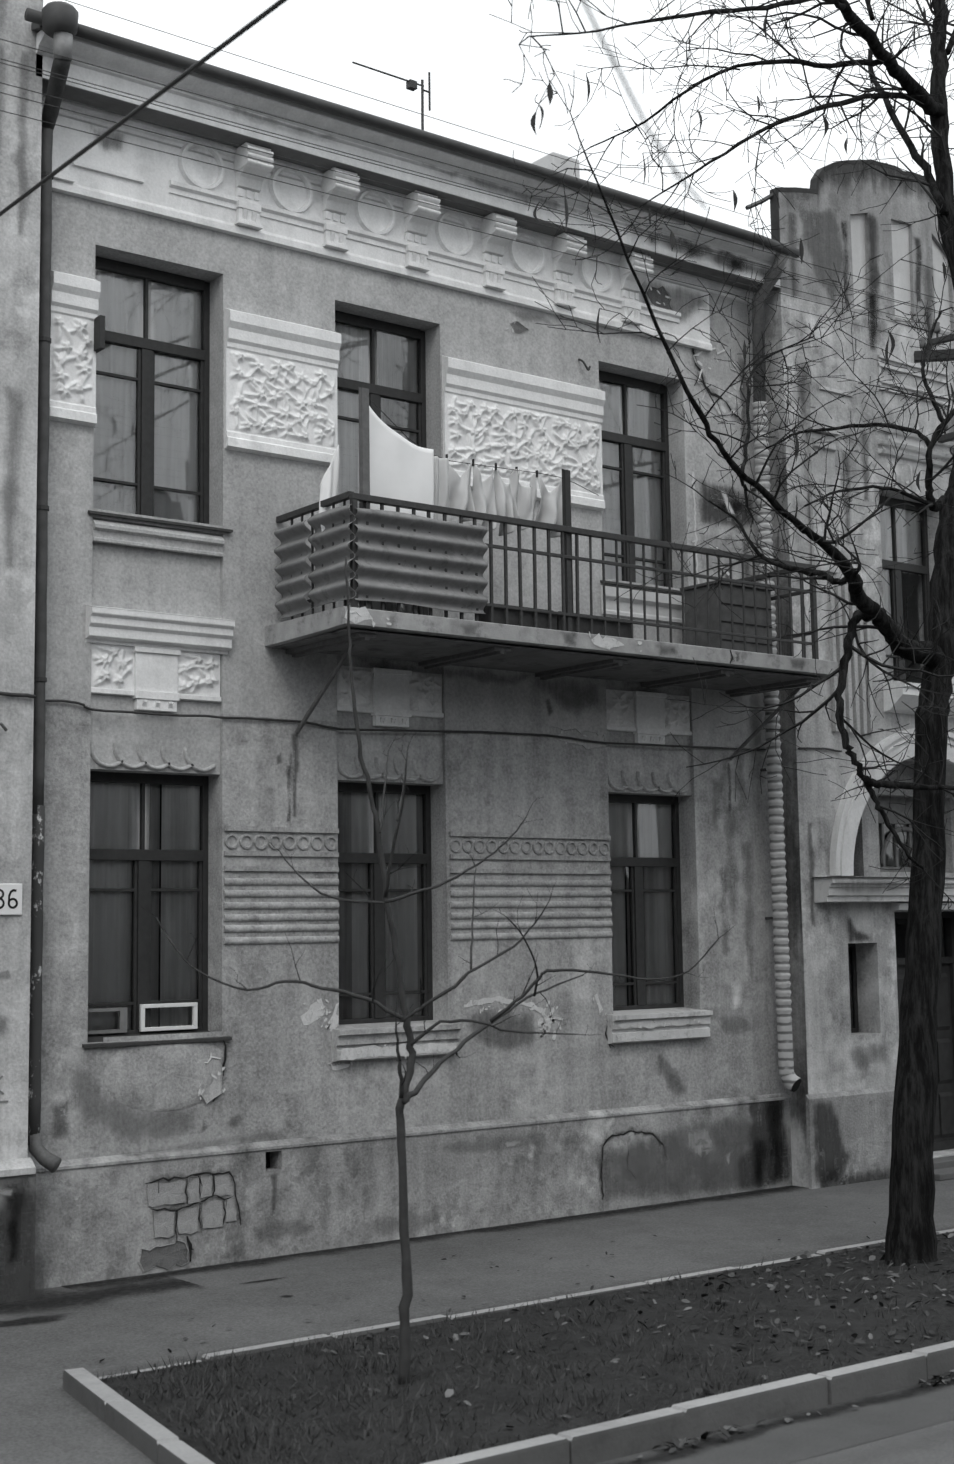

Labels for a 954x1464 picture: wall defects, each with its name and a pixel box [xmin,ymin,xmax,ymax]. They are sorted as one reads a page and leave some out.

flaking render [464,996,563,1040]
flaking render [198,1053,226,1104]
damp [0,1180,42,1304]
flaking render [138,1174,237,1273]